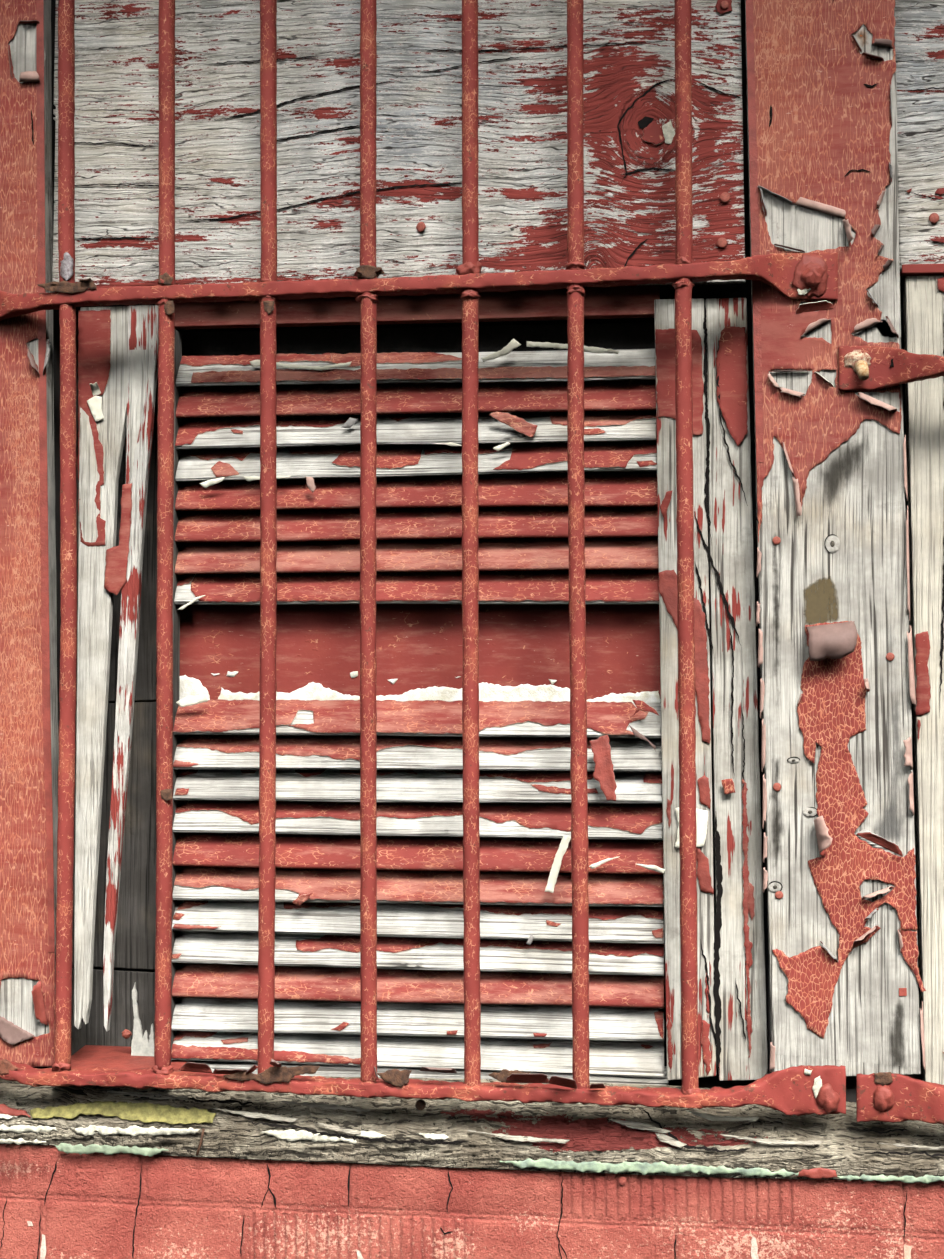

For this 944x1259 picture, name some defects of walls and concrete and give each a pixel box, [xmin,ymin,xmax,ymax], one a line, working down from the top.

rust [354,265,384,279]
peeling [173,728,259,831]
peeling [376,732,463,800]
peeling [479,721,571,801]
peeling [756,391,926,1074]
peeling [274,889,360,966]
peeling [480,910,572,971]
rust [181,1059,320,1084]
rust [374,1065,457,1087]
rust [488,1069,605,1089]
rust [804,1069,822,1098]
crack [556,1177,567,1259]